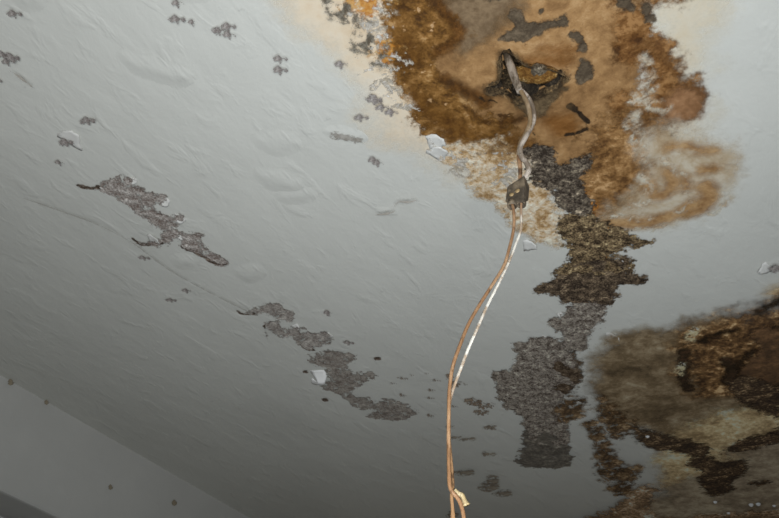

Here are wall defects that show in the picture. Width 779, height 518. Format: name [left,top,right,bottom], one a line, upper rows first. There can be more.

spalling [0,51,20,66]
leakage [347,0,420,111]
rust [287,0,738,248]
leakage [625,56,671,160]
peeling [76,175,228,267]
leakage [611,174,654,220]
spalling [464,142,656,469]
peeling [237,302,417,421]
leakage [552,288,779,518]
spalling [478,476,512,497]